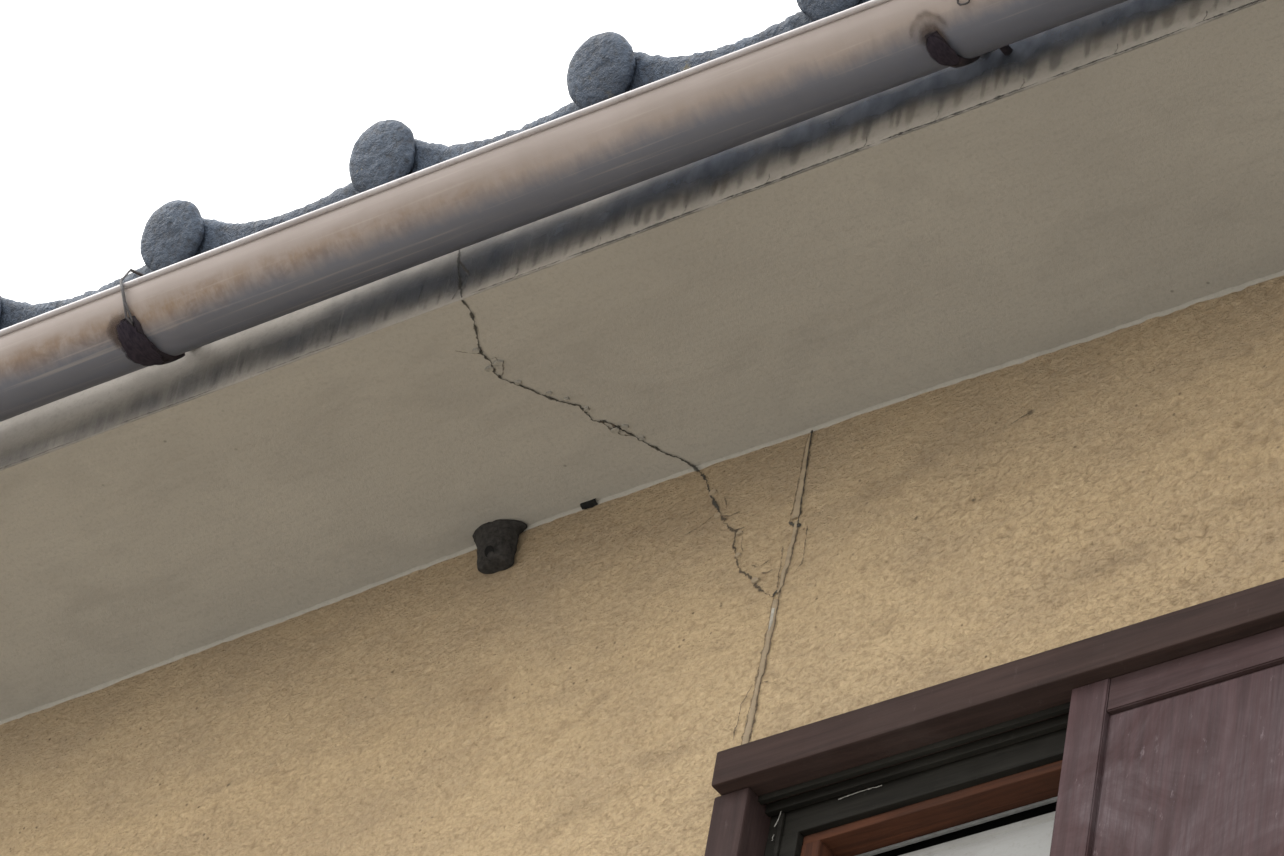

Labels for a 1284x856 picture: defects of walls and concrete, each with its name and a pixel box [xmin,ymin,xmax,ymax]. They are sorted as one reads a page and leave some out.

leakage [276,0,1188,352]
crack [452,0,1260,745]